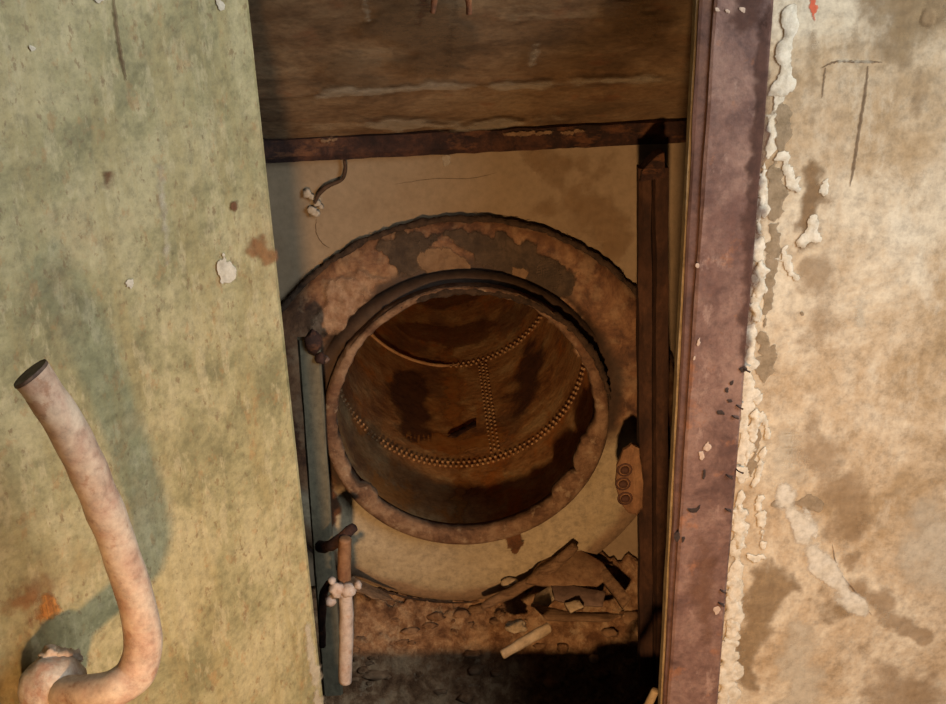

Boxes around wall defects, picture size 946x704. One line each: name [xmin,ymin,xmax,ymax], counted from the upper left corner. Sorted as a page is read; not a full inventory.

rust [503,129,585,137]
rust [734,0,772,367]
peeling [819,178,829,196]
peeling [217,253,237,284]
rust [248,236,276,265]
peeling [717,4,823,563]
rust [397,320,492,348]
rust [330,483,342,527]
rust [506,534,524,554]
water stain [776,484,868,623]
peeling [713,576,743,704]
water stain [736,567,800,689]